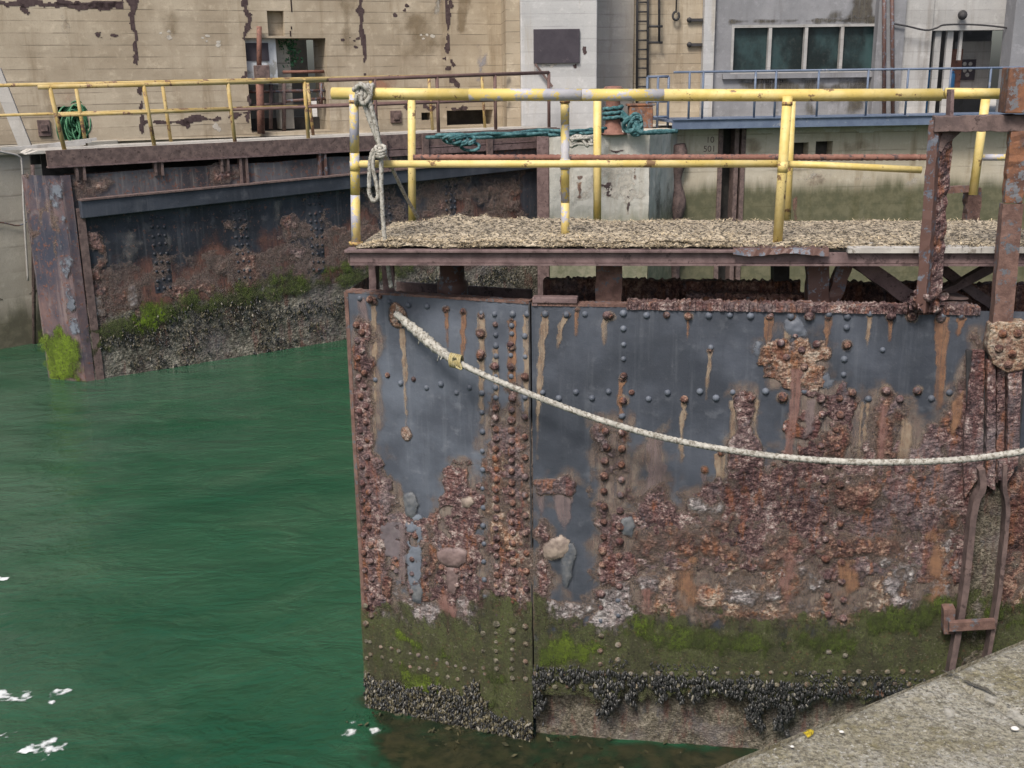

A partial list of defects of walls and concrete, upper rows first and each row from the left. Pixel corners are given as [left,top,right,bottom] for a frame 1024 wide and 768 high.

rust [78,170,527,328]
rust [351,297,412,614]
rust [442,306,984,635]